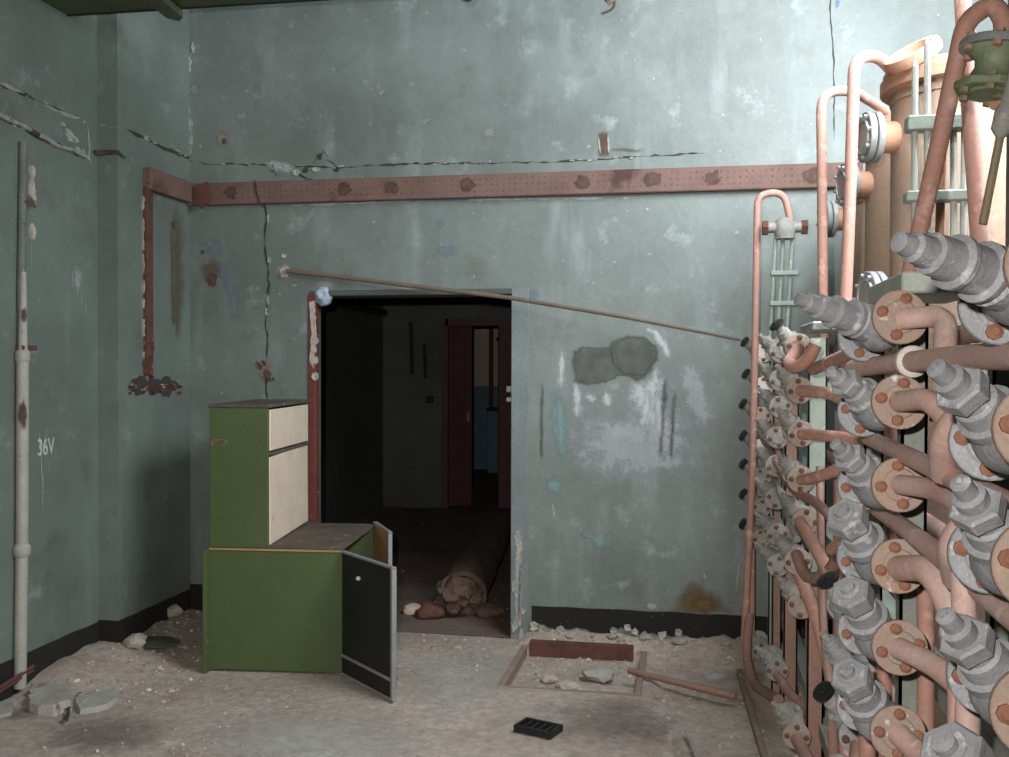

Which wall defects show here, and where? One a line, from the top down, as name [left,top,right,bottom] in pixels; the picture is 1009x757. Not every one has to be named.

crack [828,0,836,131]
rust [575,175,590,189]
rust [644,172,660,186]
rust [705,170,720,184]
crack [0,82,697,399]